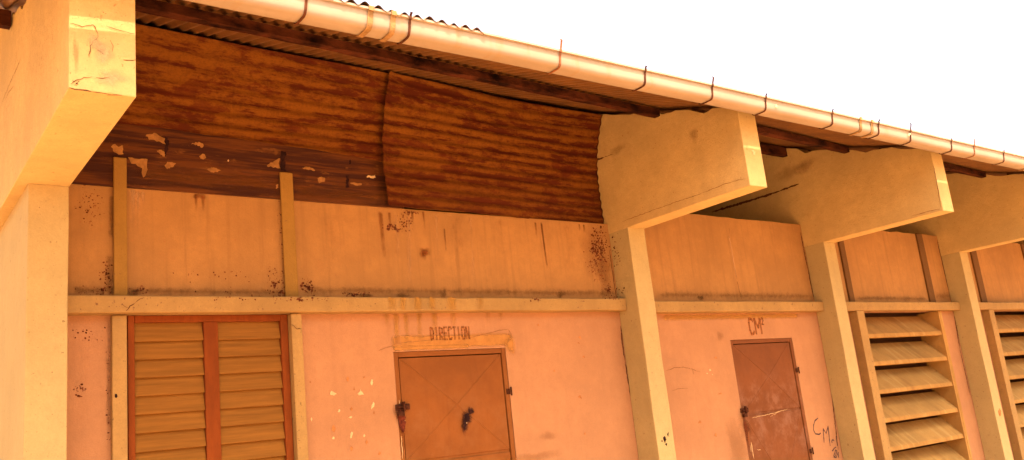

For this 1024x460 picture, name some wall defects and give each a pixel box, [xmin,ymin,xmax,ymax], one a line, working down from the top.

peeling [111,133,176,177]
peeling [192,142,229,173]
damp [382,210,419,232]
crack [625,179,798,221]
damp [213,213,327,302]
damp [583,226,625,300]